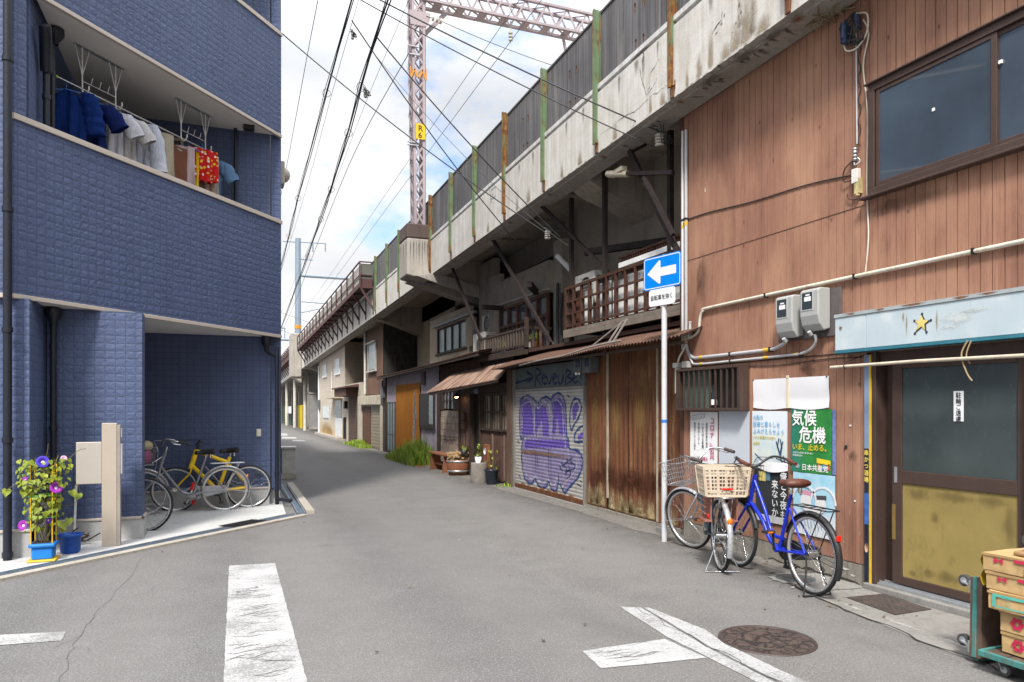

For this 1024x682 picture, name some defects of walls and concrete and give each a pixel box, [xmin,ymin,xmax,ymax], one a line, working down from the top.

crack [600,46,667,135]
rust [591,438,670,495]
crack [56,555,161,682]